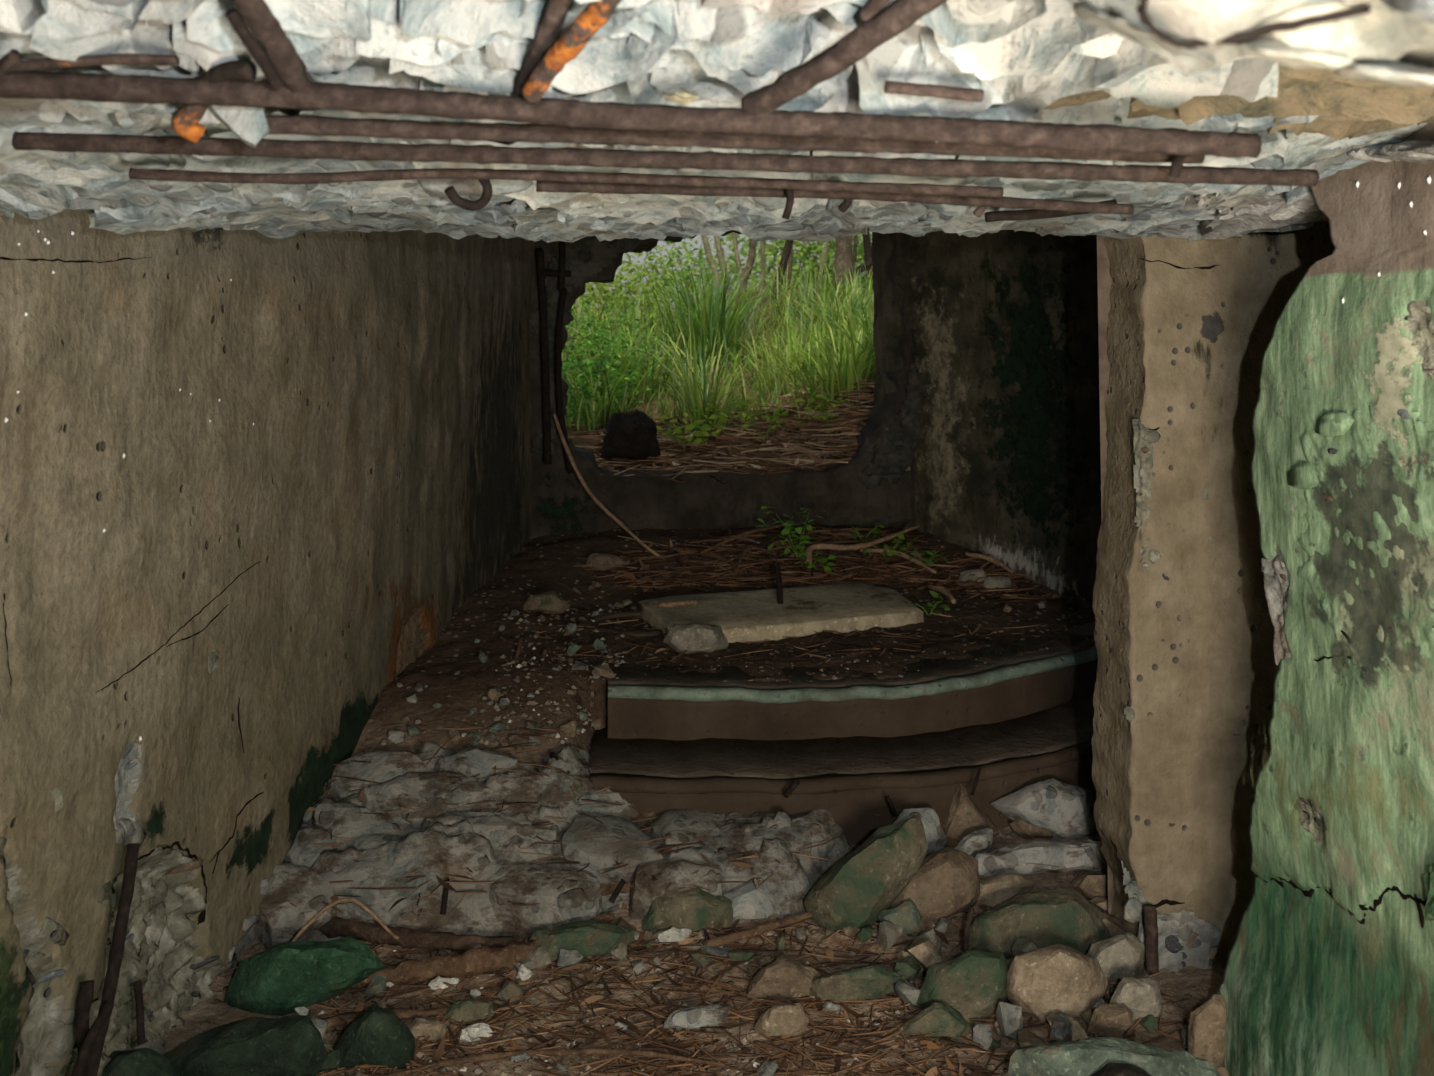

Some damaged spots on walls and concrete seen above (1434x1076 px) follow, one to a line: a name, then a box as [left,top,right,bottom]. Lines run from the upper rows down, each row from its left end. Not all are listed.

corrosion [0,0,1320,222]
crack [0,256,151,264]
spalling [0,0,1434,456]
water stain [1296,316,1434,690]
crack [3,593,12,689]
crack [97,562,260,692]
spalling [0,742,260,1076]
crack [1255,875,1427,928]